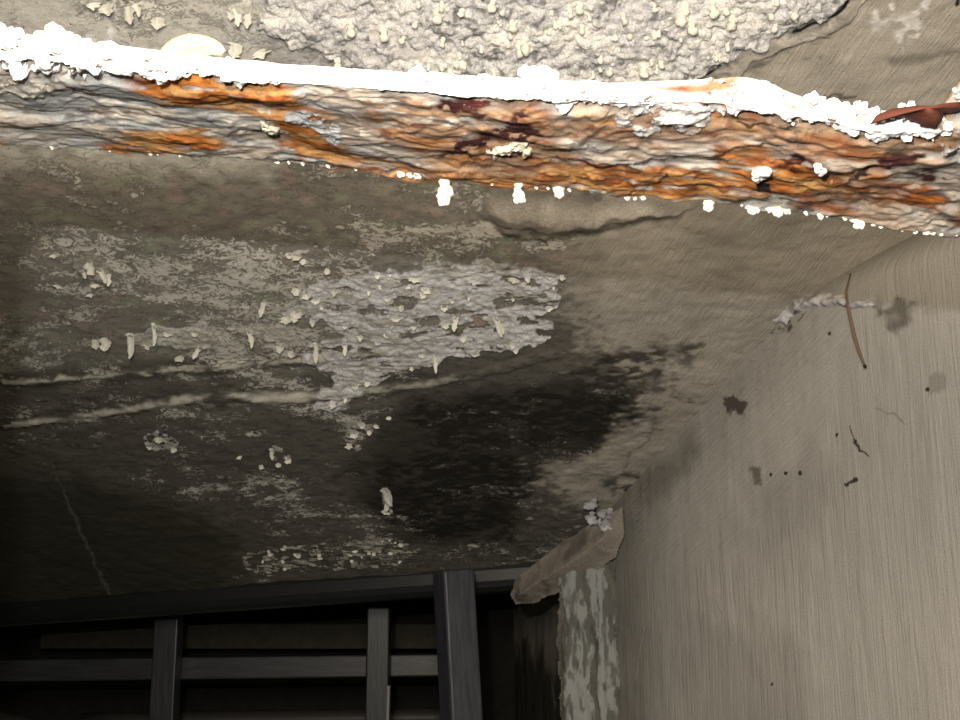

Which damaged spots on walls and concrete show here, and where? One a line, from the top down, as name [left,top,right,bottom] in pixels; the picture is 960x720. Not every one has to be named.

corrosion [161,33,226,57]
corrosion [103,128,224,156]
corrosion [132,71,960,211]
water stain [379,347,668,540]